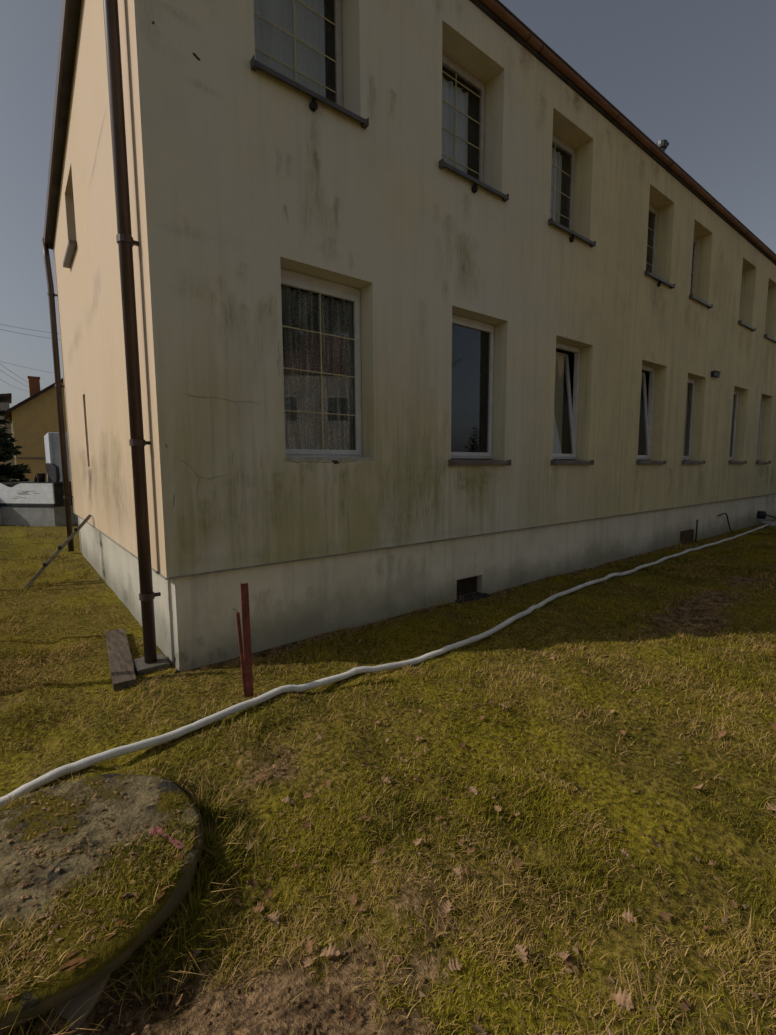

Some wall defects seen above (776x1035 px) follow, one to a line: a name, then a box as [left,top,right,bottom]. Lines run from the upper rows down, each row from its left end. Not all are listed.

crack [261,458,352,467]